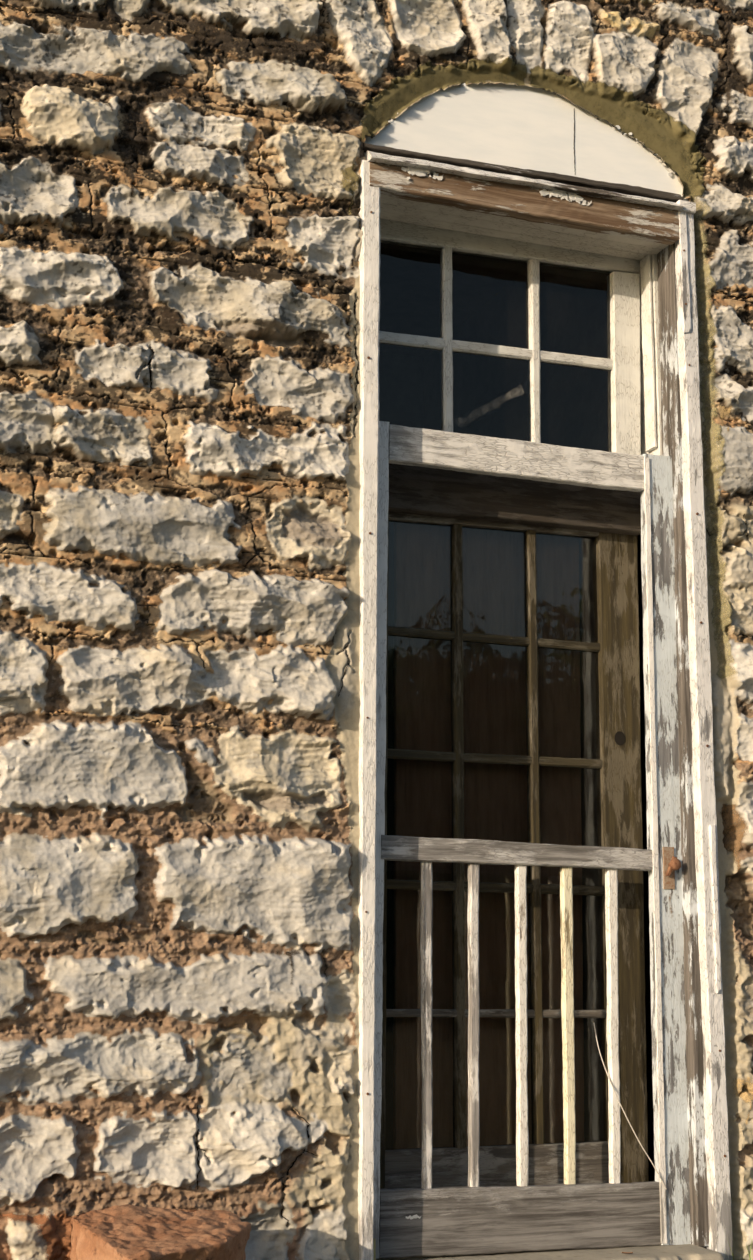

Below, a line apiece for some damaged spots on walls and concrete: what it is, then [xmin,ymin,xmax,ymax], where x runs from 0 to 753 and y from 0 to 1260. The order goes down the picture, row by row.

peeling [401,166,443,180]
peeling [539,188,592,206]
crack [196,1105,209,1189]
crack [273,1107,316,1225]